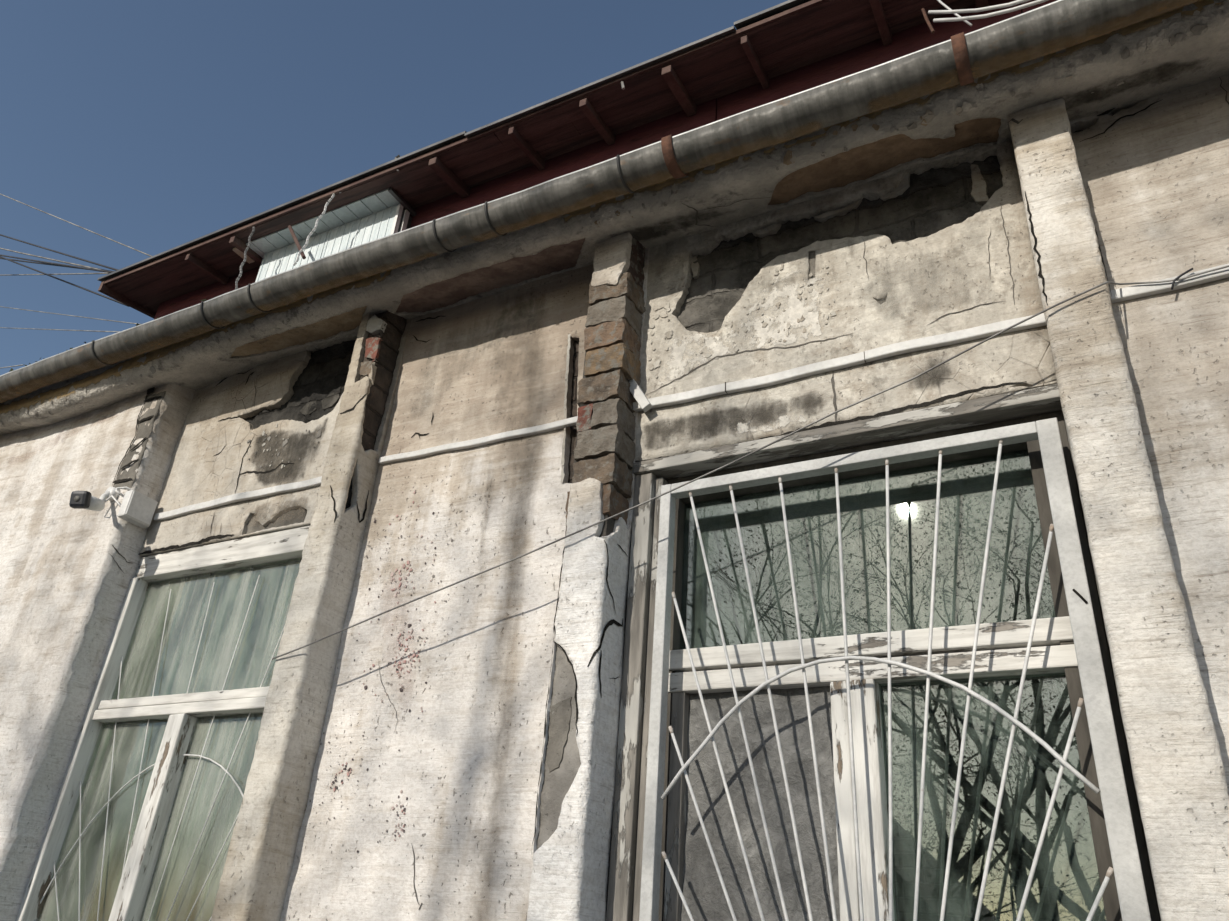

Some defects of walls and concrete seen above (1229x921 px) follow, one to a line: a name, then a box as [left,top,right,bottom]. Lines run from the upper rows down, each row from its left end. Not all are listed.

crack [1080,99,1163,142]
crack [928,191,1048,325]
flaking render [112,387,166,490]
crack [330,485,369,523]
flaking render [231,238,585,469]
leakage [645,394,821,448]
crack [647,333,852,395]
flaking render [561,117,1003,562]
flaking render [537,644,581,849]
crack [532,519,628,845]